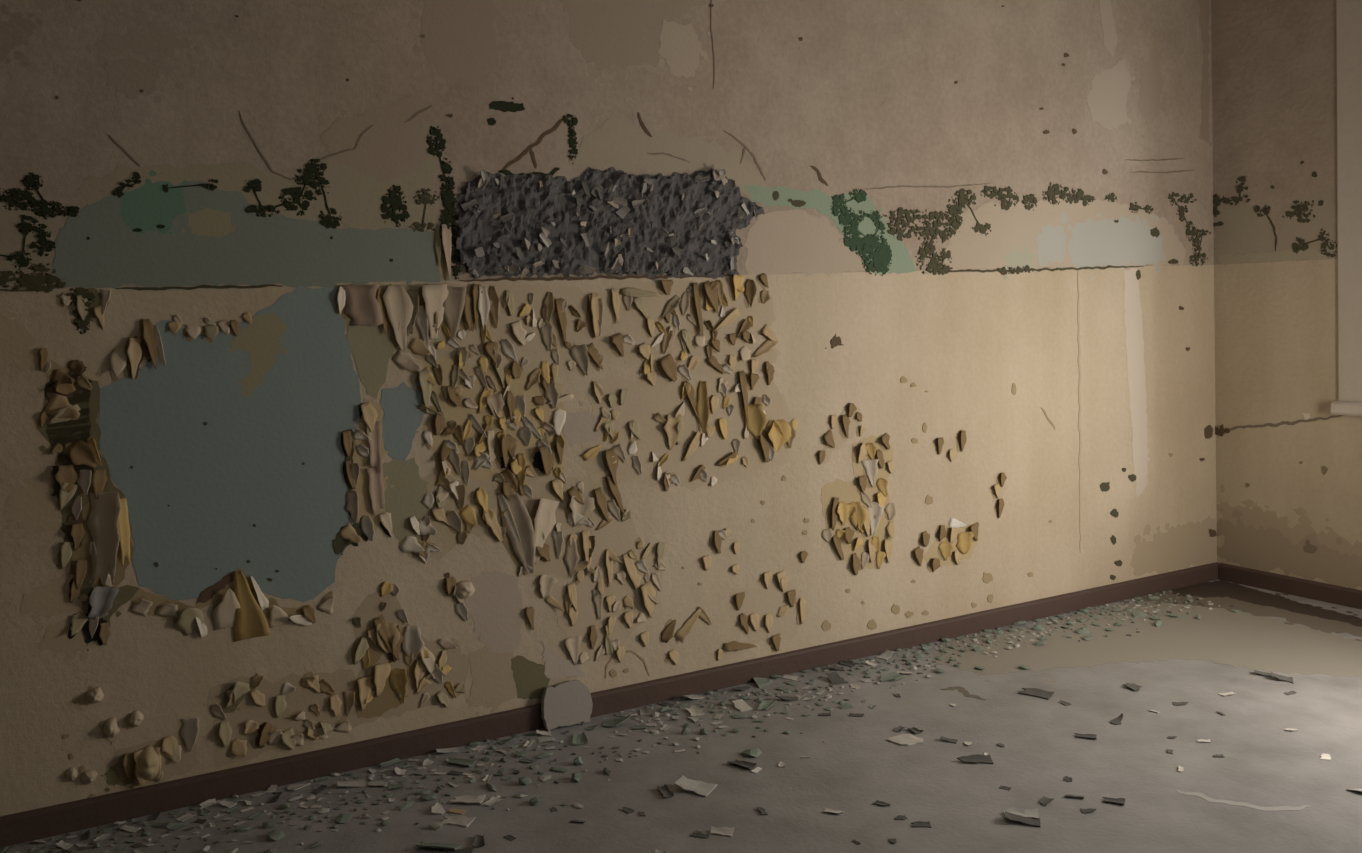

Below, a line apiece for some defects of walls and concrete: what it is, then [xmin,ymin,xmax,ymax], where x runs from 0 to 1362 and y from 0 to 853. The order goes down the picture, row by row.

water stain [244,92,440,239]
water stain [113,172,142,198]
water stain [162,179,218,193]
water stain [772,191,806,207]
water stain [1213,194,1230,217]
mould [830,189,892,276]
peeling [0,114,1186,677]
peeling [110,581,517,789]
peeling [1018,688,1054,700]
peeling [888,726,924,745]
peeling [940,736,994,764]
peeling [657,775,717,798]